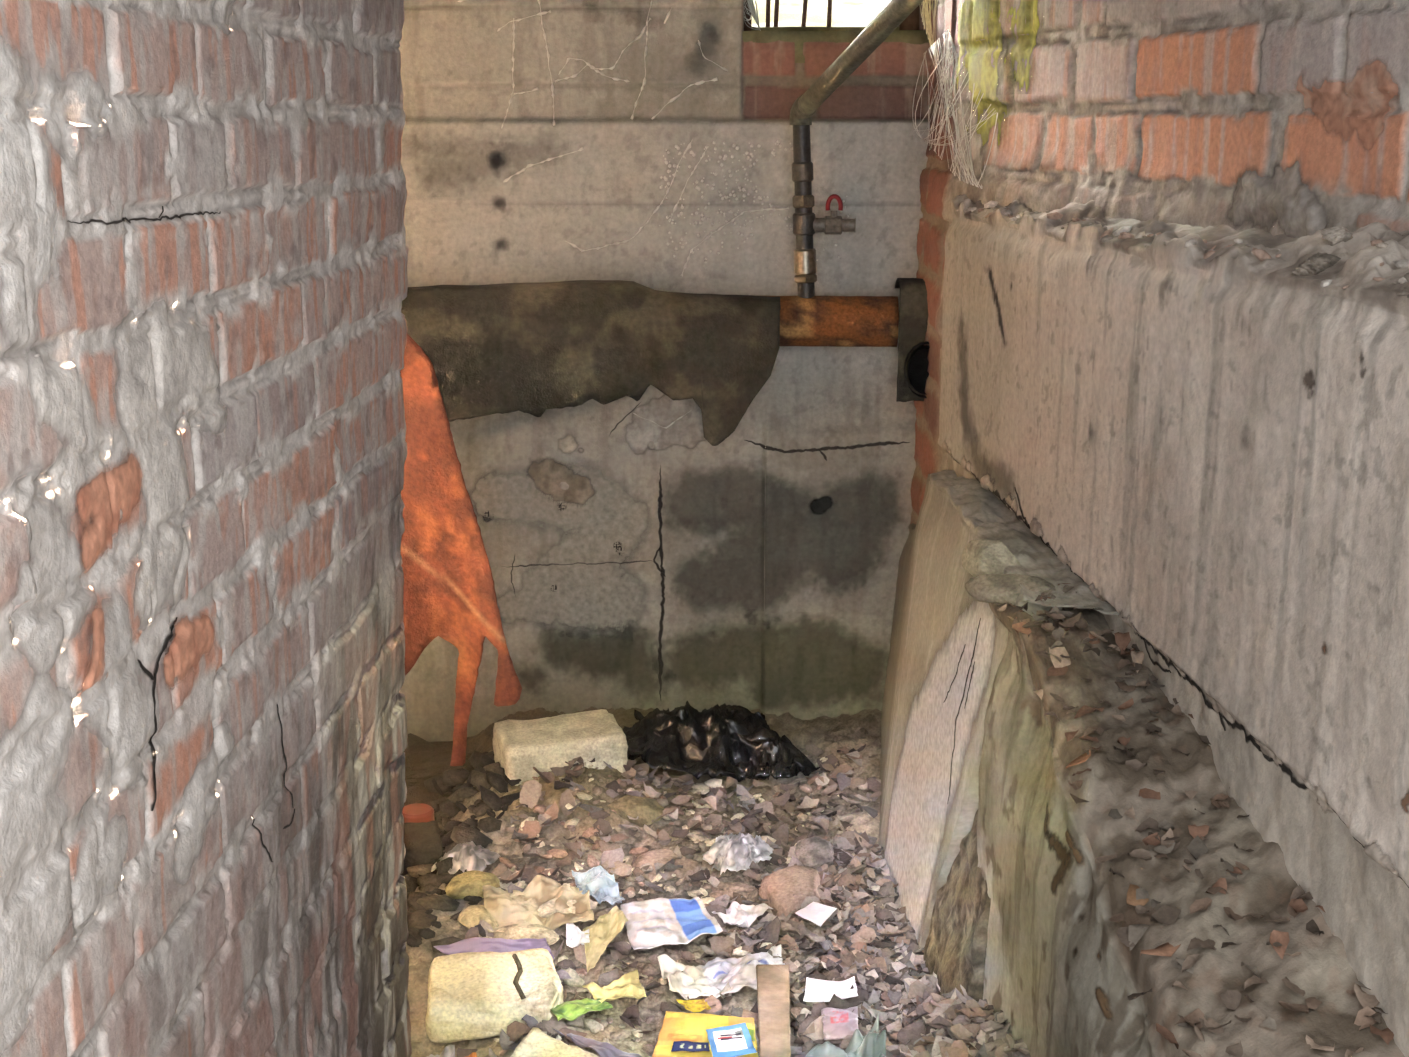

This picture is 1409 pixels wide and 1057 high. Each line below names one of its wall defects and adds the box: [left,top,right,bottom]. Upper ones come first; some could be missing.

leakage [1004,0,1039,91]
spalling [1297,60,1398,150]
crack [68,206,221,225]
spalling [626,395,706,454]
peeling [0,39,234,1055]
crack [502,465,665,700]
leakage [472,466,896,708]
crack [955,460,1108,603]
crack [138,617,178,811]
crack [1134,627,1364,848]